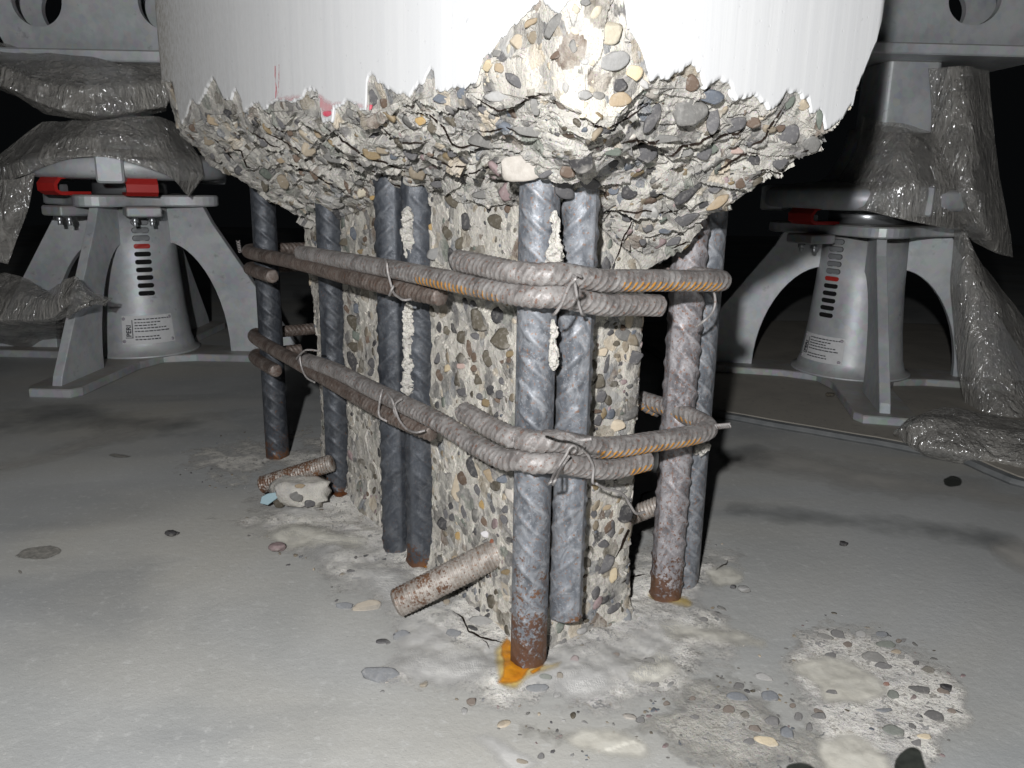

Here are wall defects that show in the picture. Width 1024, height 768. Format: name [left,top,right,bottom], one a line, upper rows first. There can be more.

crack [212,94,546,194]
spalling [163,0,840,270]
crack [578,105,784,182]
crack [605,208,686,260]
spalling [342,284,379,383]
spalling [429,291,517,449]
spalling [589,316,644,437]
spalling [344,400,383,528]
spalling [426,433,514,636]
spalling [547,473,635,650]
crack [451,610,503,647]
rust [497,640,547,687]